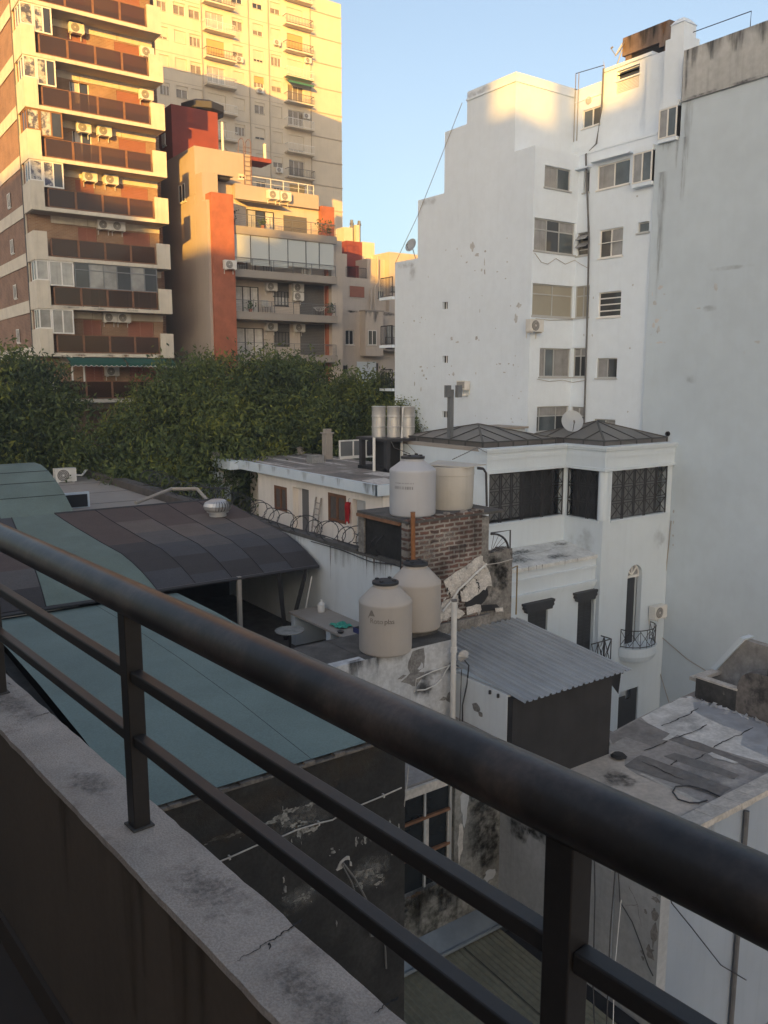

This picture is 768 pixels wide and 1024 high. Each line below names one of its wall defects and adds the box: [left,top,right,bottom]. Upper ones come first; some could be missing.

peeling [441,556,492,622]
flaking render [398,648,425,686]
peeling [265,802,321,845]
peeling [329,836,385,889]
leakage [472,802,498,876]
crack [237,919,302,961]